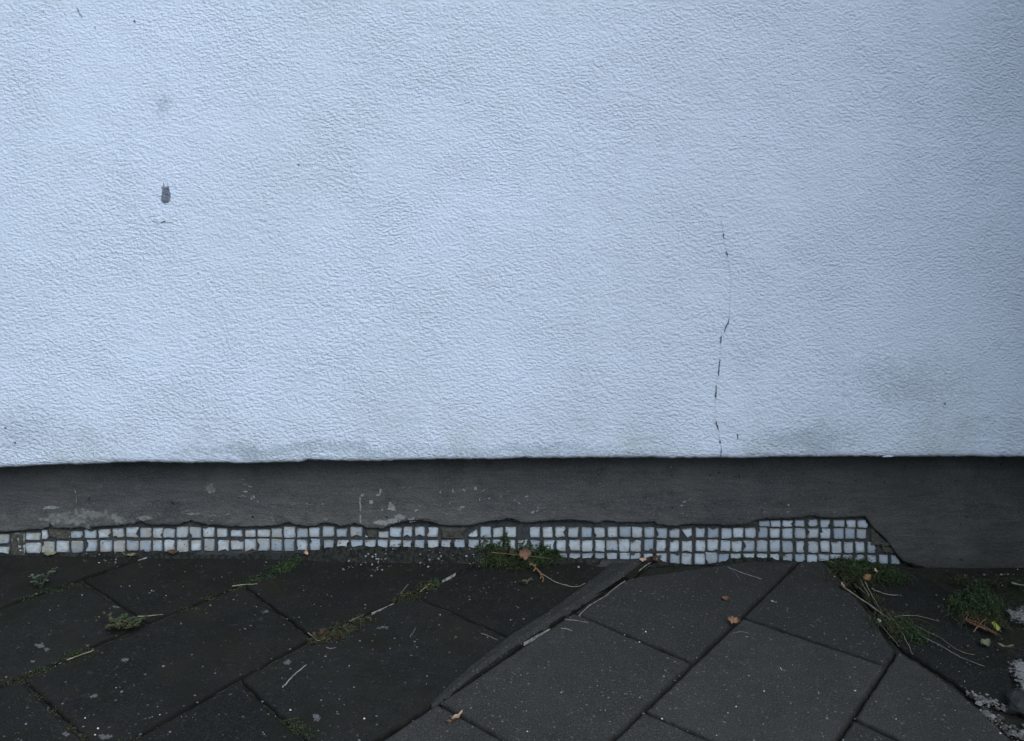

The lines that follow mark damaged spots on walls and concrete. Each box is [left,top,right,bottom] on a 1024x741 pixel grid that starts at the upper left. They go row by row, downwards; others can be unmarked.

crack [715,219,738,453]
spalling [10,532,26,555]
peeling [39,506,152,540]
spalling [440,527,466,540]
spalling [868,523,897,556]